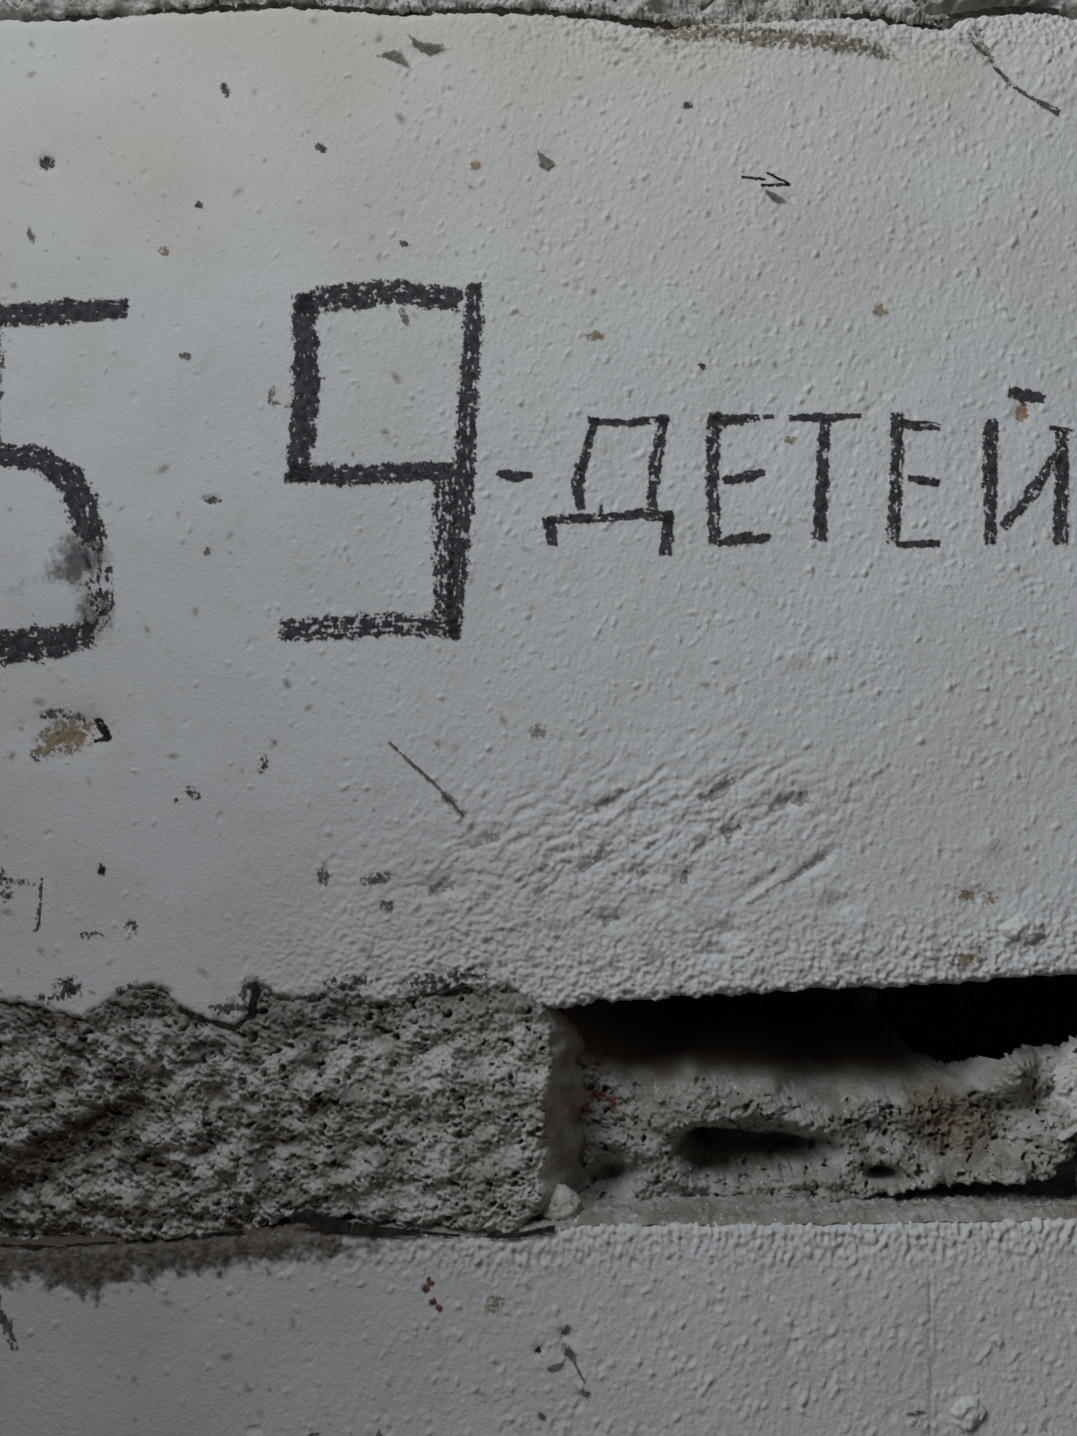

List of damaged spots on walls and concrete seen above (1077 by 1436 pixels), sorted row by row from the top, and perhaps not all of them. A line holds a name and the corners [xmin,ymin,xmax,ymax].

spalling [558,985,1077,1202]